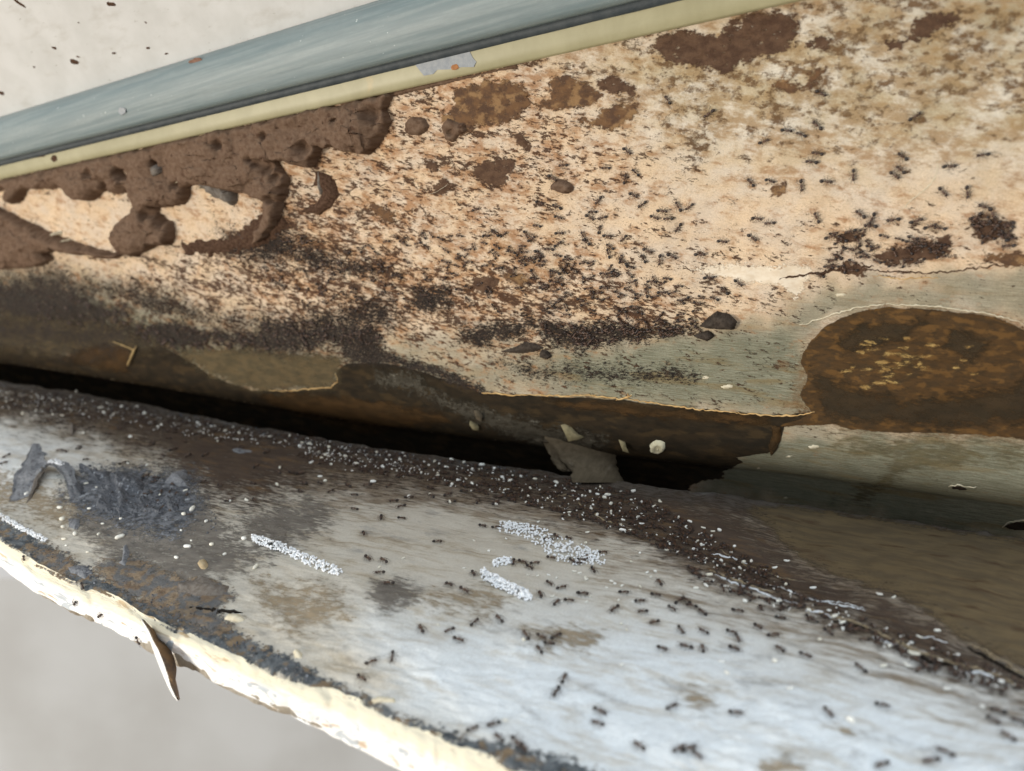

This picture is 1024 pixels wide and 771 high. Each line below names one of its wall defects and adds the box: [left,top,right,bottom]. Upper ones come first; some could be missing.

damp [472,271,529,294]
crack [779,264,1022,280]
damp [171,346,343,392]
damp [781,307,1024,502]
peeling [0,343,1024,771]